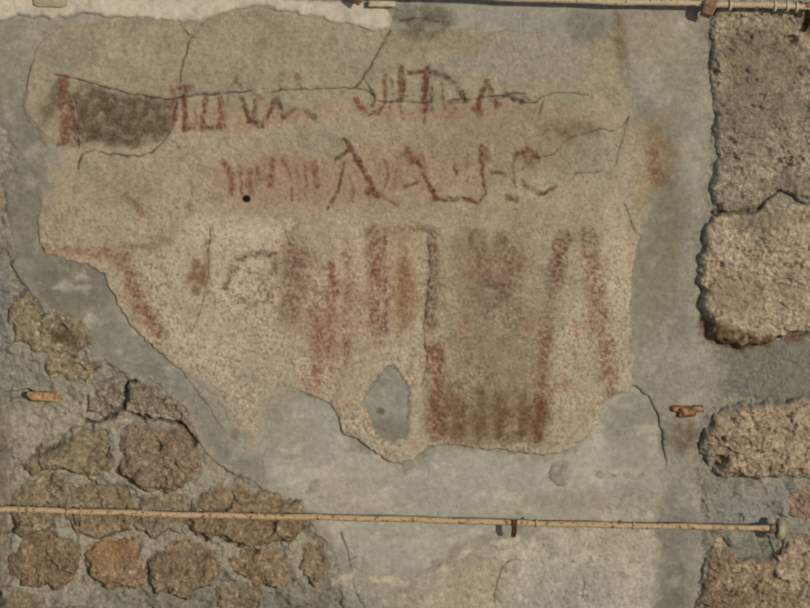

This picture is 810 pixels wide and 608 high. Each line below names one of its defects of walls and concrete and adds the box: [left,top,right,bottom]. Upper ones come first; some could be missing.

spalling [11,252,669,578]